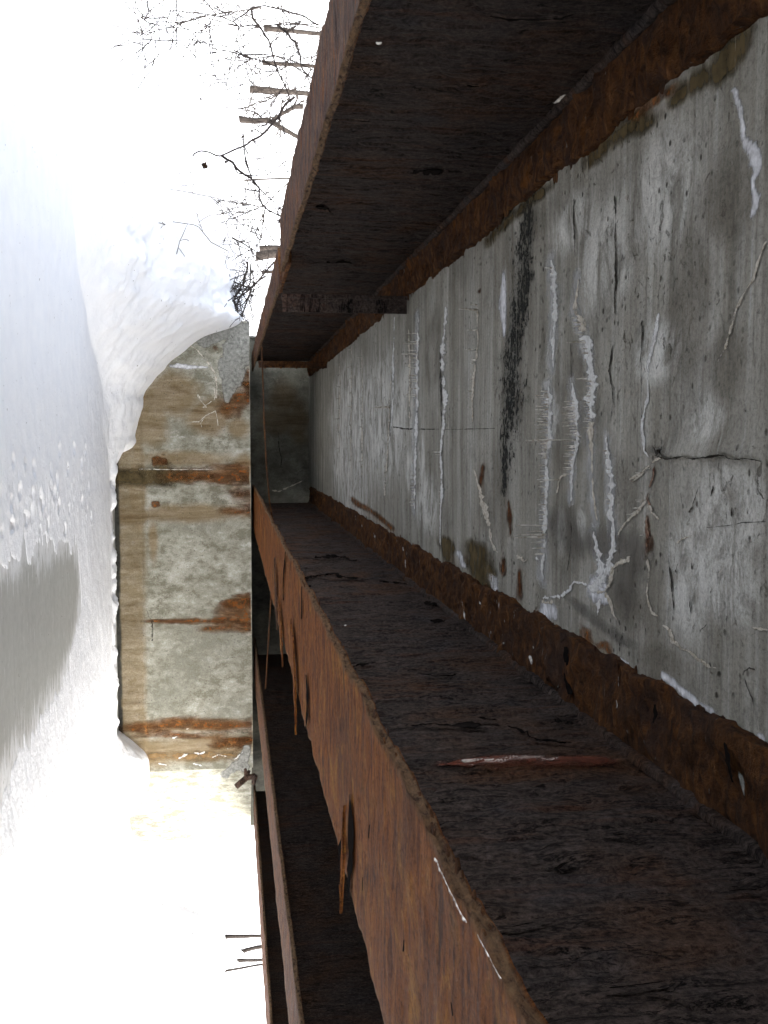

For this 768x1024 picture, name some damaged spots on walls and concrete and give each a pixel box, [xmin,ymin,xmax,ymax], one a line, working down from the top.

corrosion [582,26,752,169]
efflorescence [732,87,762,217]
corrosion [485,182,554,247]
water stain [497,197,646,643]
corrosion [115,454,250,515]
corrosion [351,497,394,531]
crack [629,313,765,668]
corrosion [437,535,523,599]
corrosion [147,593,251,632]
corrosion [274,557,297,735]
corrosion [127,718,252,749]